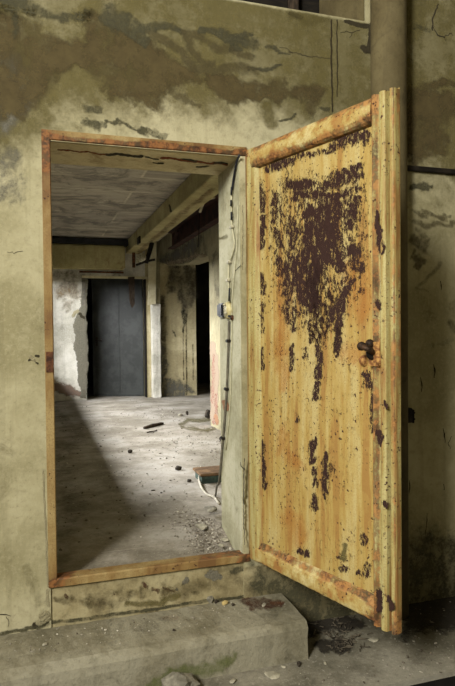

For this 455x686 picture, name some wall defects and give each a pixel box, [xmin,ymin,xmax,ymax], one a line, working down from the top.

crack [420,4,453,39]
water stain [0,0,371,176]
water stain [407,0,455,181]
spalling [72,278,89,398]
water stain [160,265,198,397]
water stain [51,585,205,624]
rust [242,597,283,611]
water stain [409,531,455,604]